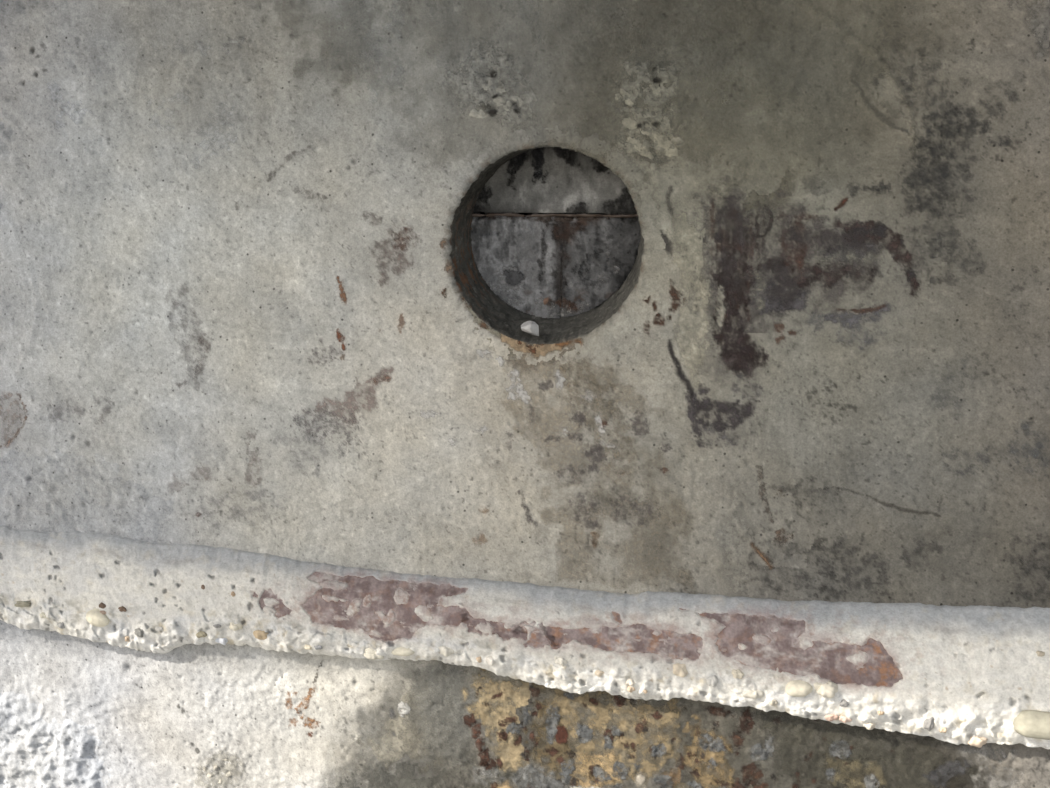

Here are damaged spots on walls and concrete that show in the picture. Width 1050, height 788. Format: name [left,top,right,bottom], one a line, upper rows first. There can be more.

corrosion [489,216,610,311]
leakage [335,663,533,788]
corrosion [463,667,776,788]
leakage [572,702,985,788]